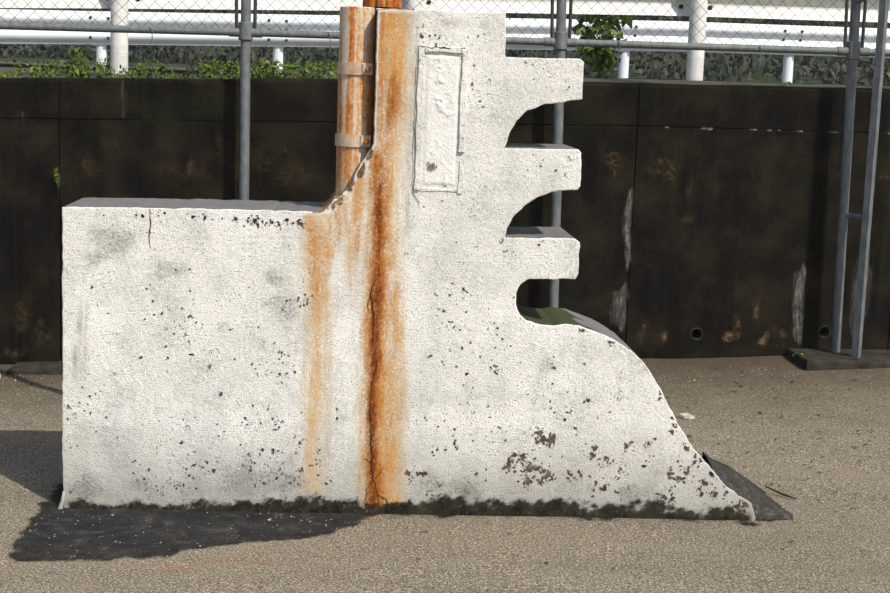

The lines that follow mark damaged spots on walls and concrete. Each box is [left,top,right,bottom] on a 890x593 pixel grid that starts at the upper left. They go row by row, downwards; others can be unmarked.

spalling [328,149,373,210]
corrosion [306,12,408,512]
crack [367,282,375,342]
damp [610,288,627,330]
damp [793,267,806,339]
crack [363,362,388,506]